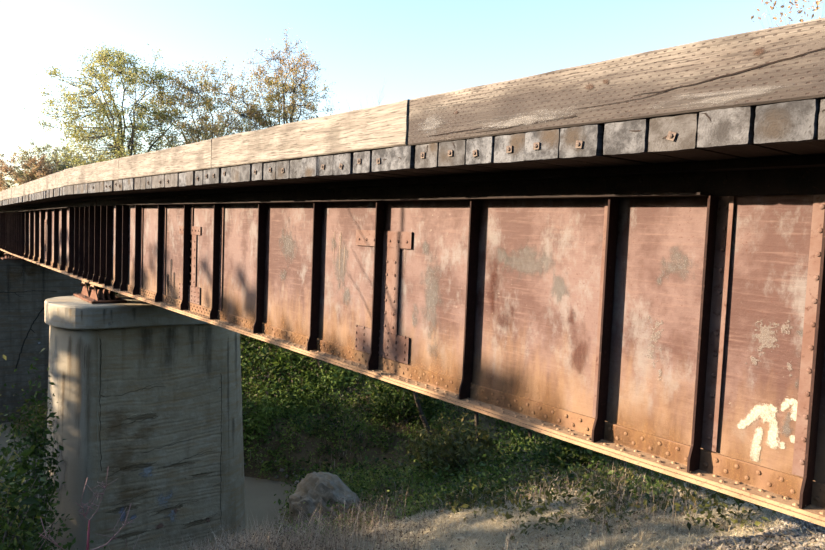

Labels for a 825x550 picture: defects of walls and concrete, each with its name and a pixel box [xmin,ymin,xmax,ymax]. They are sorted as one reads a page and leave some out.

crack [426,48,825,153]
corrosion [220,310,254,329]
peeling [745,318,803,365]